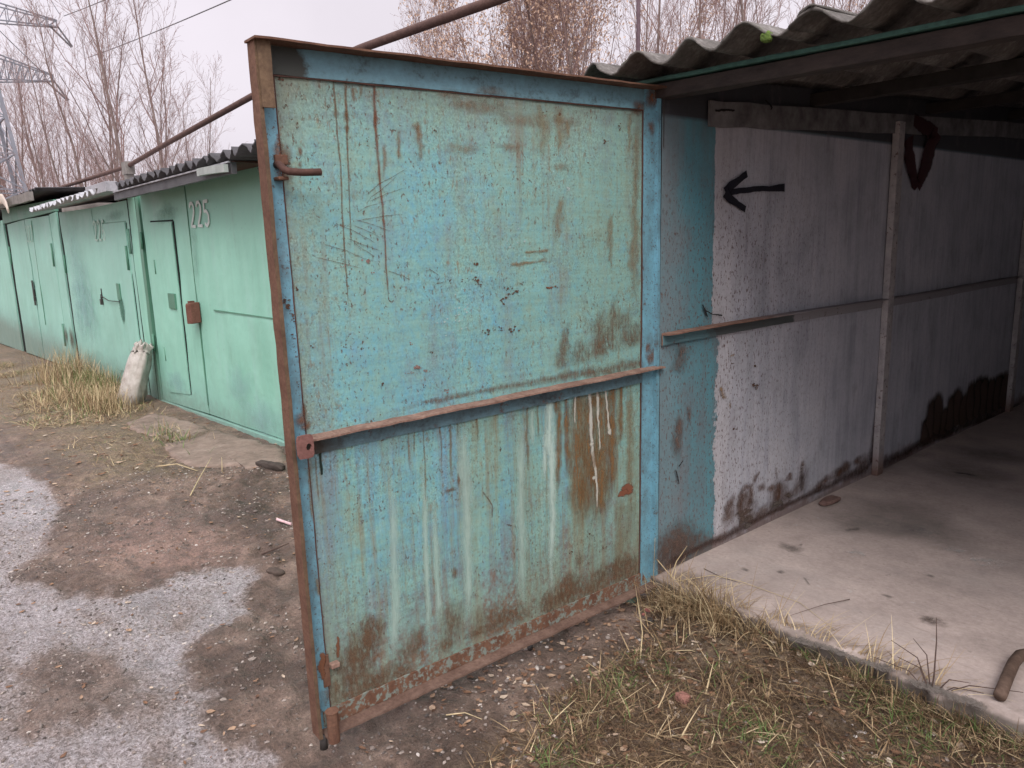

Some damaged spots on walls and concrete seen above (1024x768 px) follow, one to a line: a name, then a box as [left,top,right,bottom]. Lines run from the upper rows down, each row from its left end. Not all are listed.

rust [333,80,400,294]
rust [543,309,654,381]
rust [554,387,633,510]
rust [673,405,1018,562]
rust [317,622,409,698]